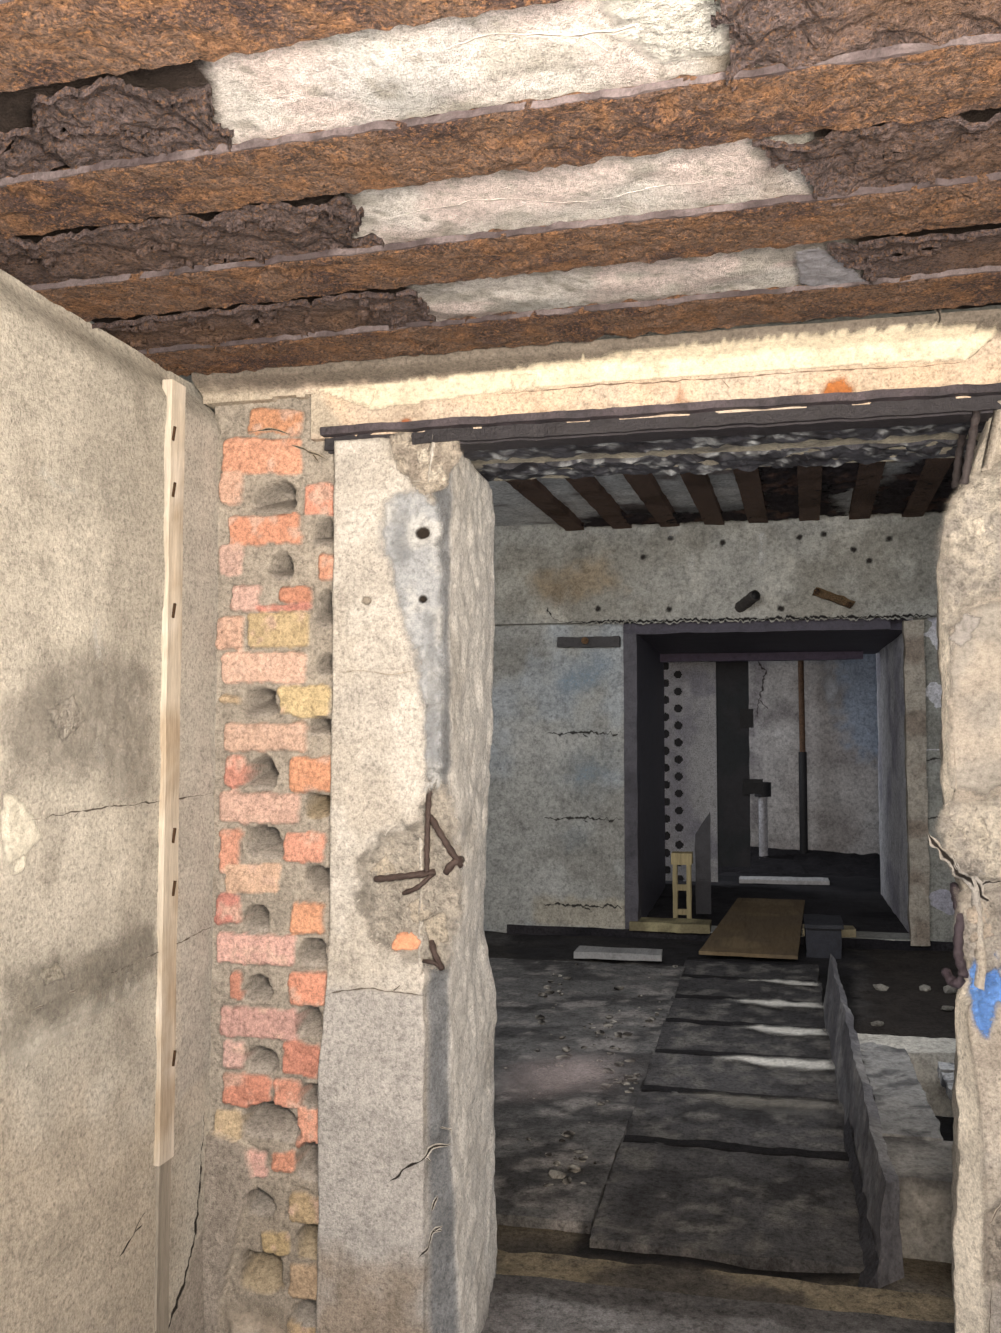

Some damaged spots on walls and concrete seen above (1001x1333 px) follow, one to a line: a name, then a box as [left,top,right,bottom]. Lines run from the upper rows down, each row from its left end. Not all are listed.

corrosion [711,0,1001,92]
corrosion [0,75,234,179]
corrosion [752,113,1001,211]
corrosion [0,194,385,290]
corrosion [827,228,1001,287]
corrosion [92,289,436,350]
spalling [390,432,462,495]
flaking render [939,411,1001,989]
spalling [357,784,465,971]